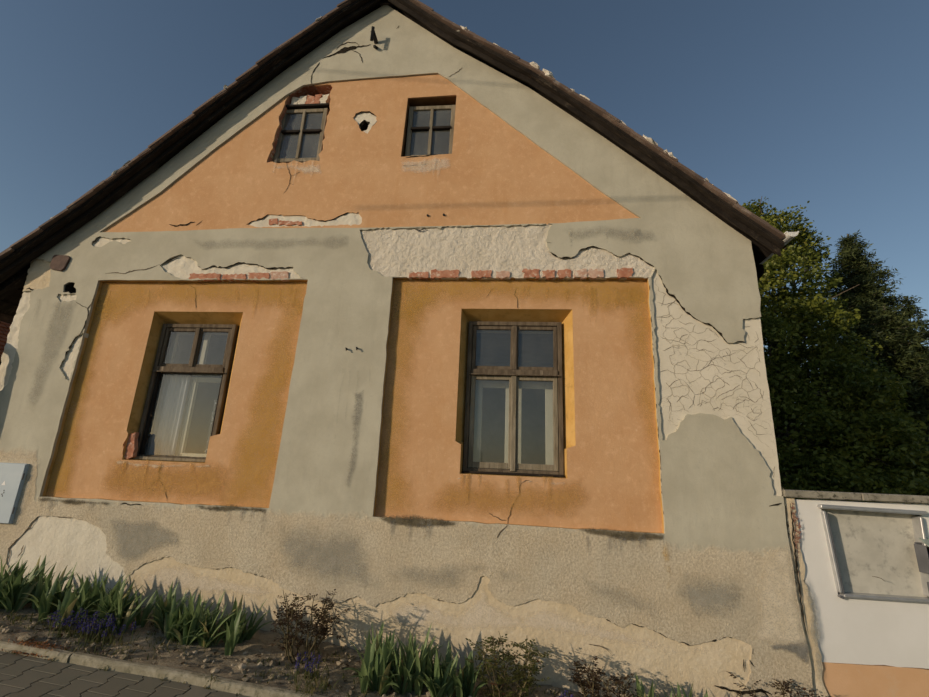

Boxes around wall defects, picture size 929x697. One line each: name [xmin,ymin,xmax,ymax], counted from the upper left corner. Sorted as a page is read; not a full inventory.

crack [311,42,371,84]
spalling [286,94,330,111]
peeling [161,255,300,282]
peeling [61,324,89,380]
peeling [248,213,782,496]
crack [547,242,775,514]
peeling [7,516,751,697]